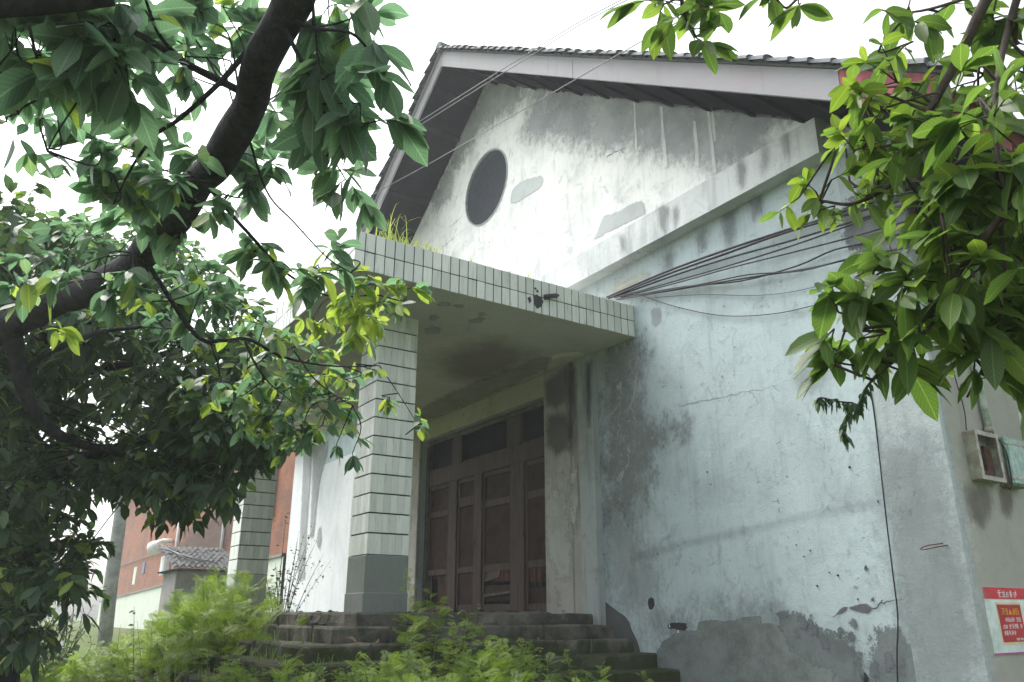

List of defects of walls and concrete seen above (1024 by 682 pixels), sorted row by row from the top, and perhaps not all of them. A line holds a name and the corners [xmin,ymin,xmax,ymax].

spalling [528,287,559,308]
damp [546,363,573,453]
crack [679,376,800,407]
damp [603,341,687,612]
flaking render [656,597,916,682]